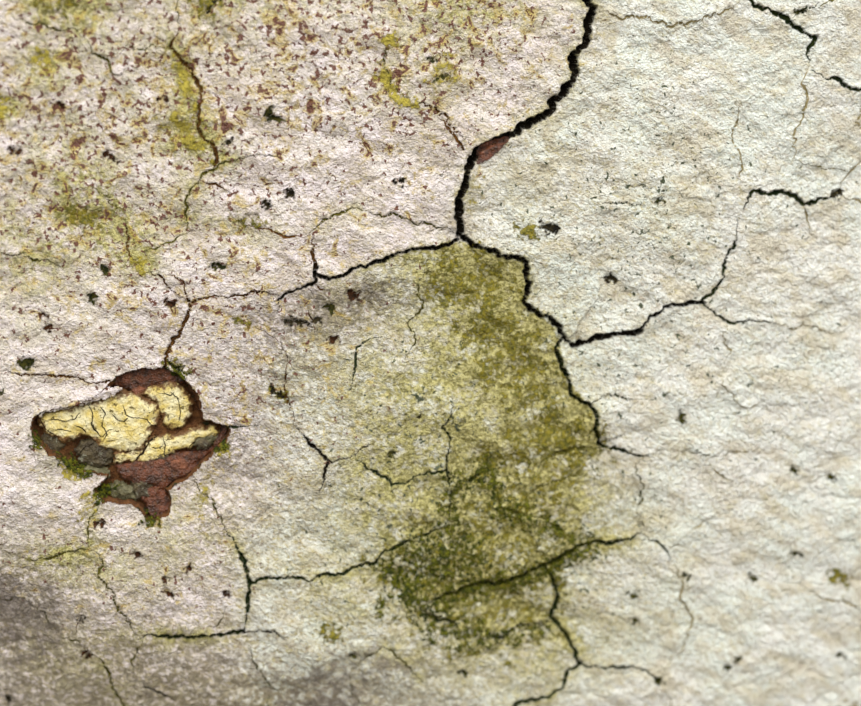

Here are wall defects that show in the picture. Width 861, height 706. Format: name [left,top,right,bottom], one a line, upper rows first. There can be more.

crack [12,0,279,264]
crack [487,0,740,145]
crack [749,0,861,203]
crack [1,252,64,269]
crack [5,370,110,384]
spalling [28,364,231,528]
crack [146,96,844,706]
crack [1,597,81,641]
crack [19,479,449,706]
crack [800,585,861,610]